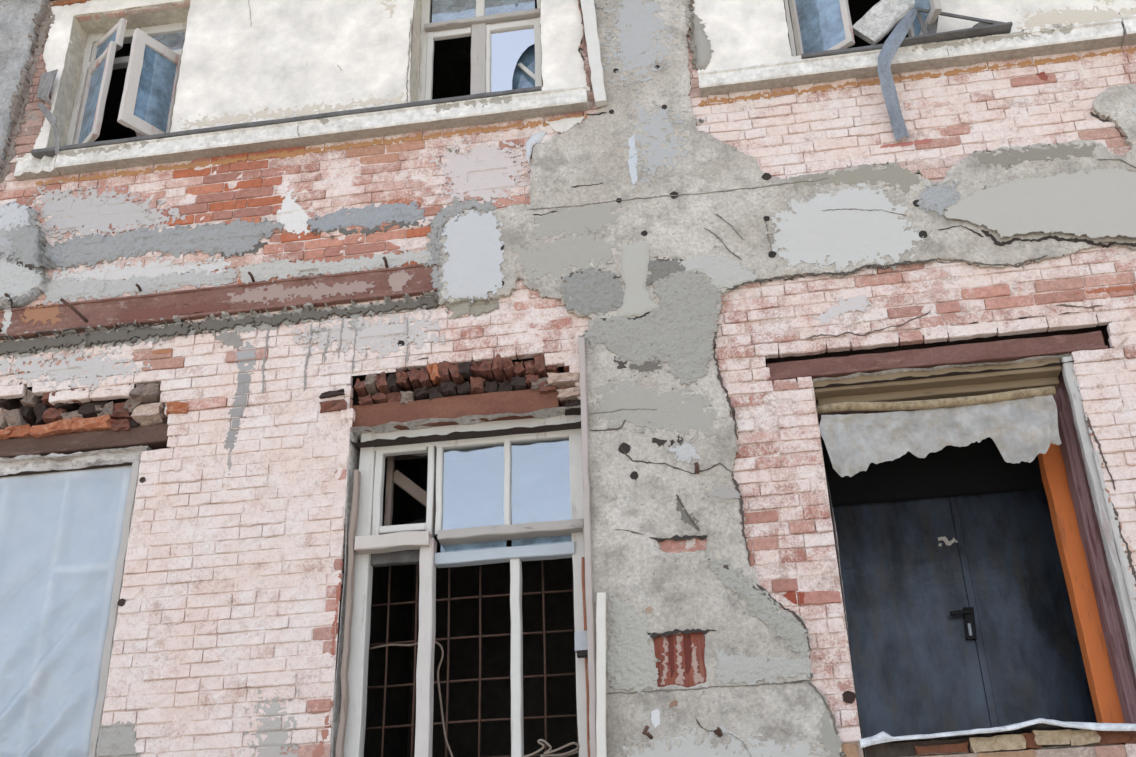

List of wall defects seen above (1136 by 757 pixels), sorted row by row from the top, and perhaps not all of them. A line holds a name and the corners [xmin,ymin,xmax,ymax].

spalling [682,0,714,71]
spalling [560,256,728,386]
crack [713,331,738,440]
crack [591,408,811,650]
crack [606,680,837,756]